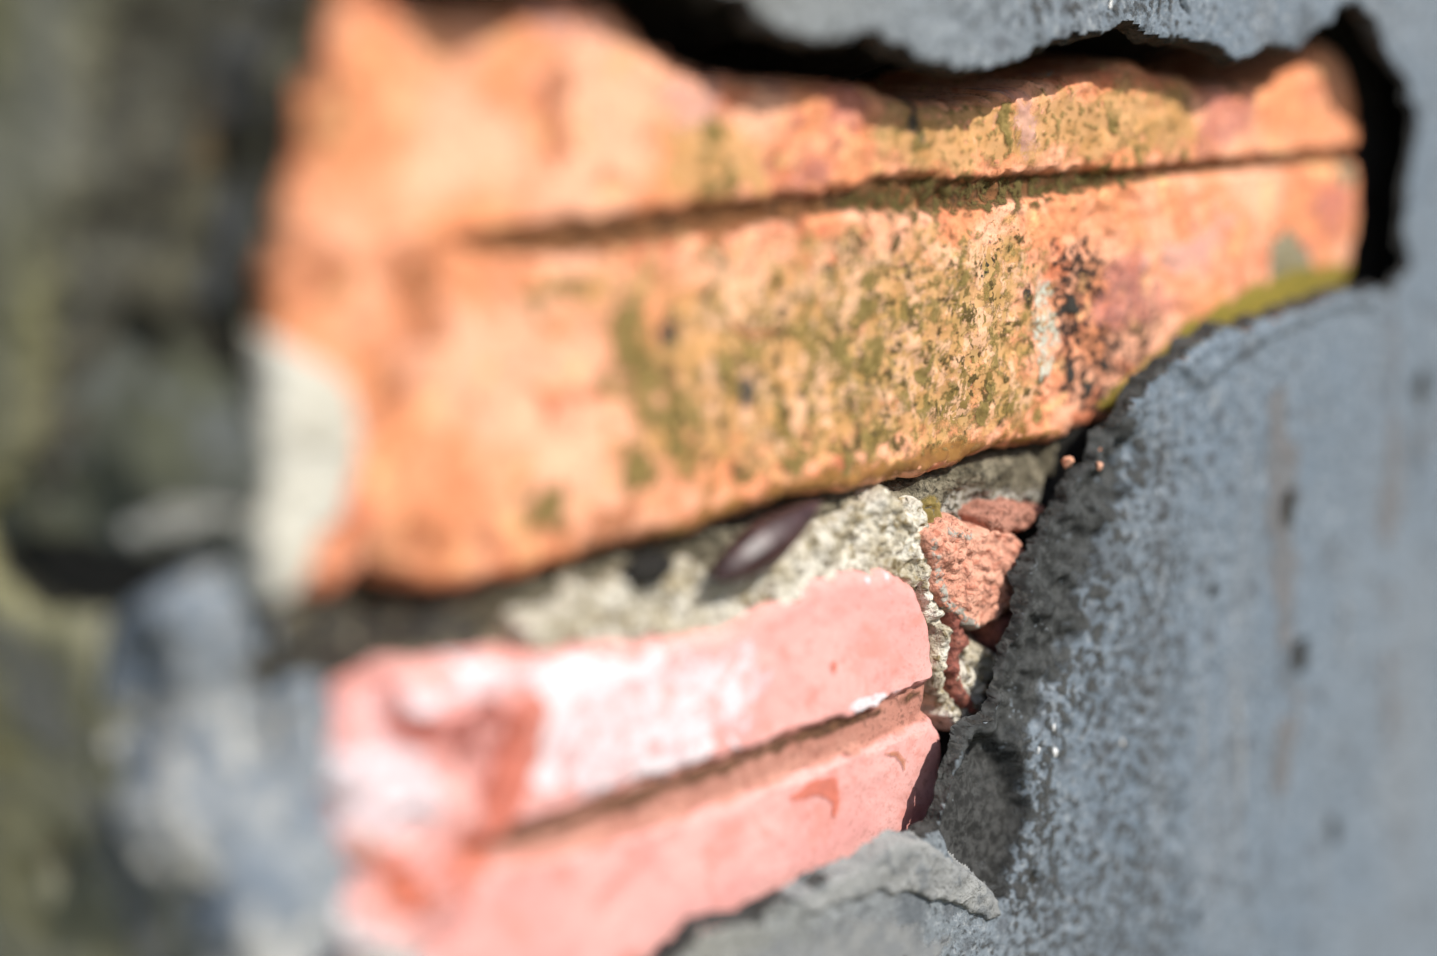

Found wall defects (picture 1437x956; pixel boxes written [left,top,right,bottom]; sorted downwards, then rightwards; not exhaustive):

spalling [0,0,327,504]
damp [387,234,450,344]
damp [656,307,680,348]
damp [738,377,755,408]
damp [1049,236,1163,412]
damp [540,426,1060,566]
spalling [600,0,1421,956]
spalling [0,536,135,627]